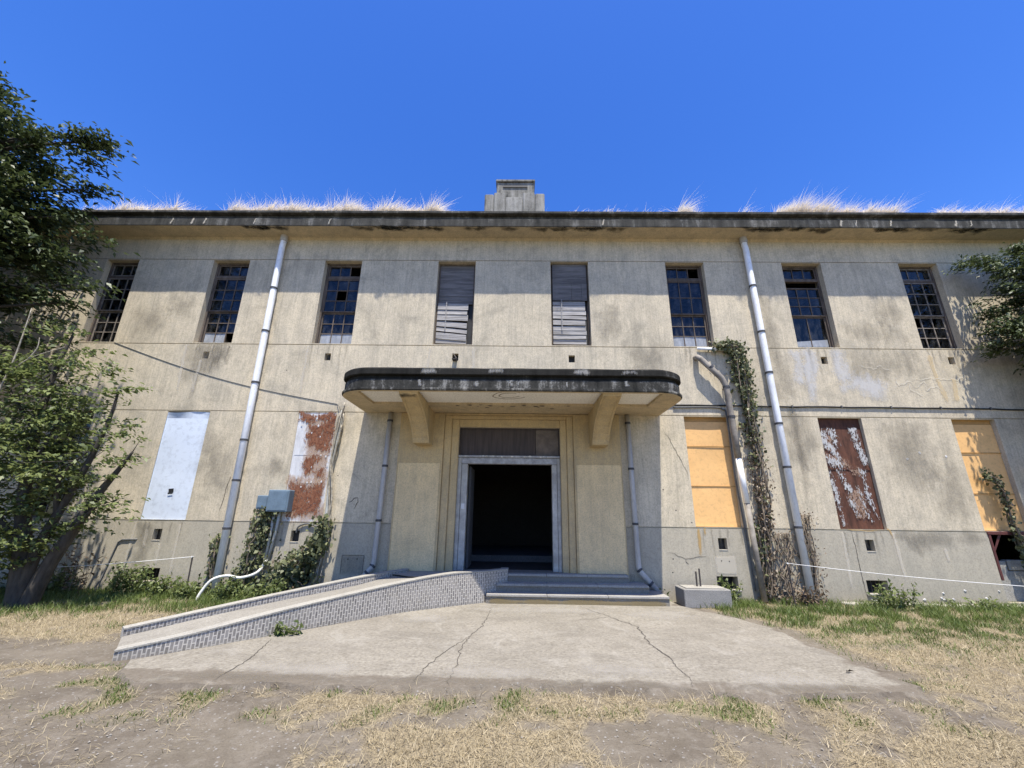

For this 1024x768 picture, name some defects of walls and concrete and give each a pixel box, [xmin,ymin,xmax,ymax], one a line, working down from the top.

corrosion [285,411,337,521]
corrosion [822,435,893,536]
crack [414,608,491,684]